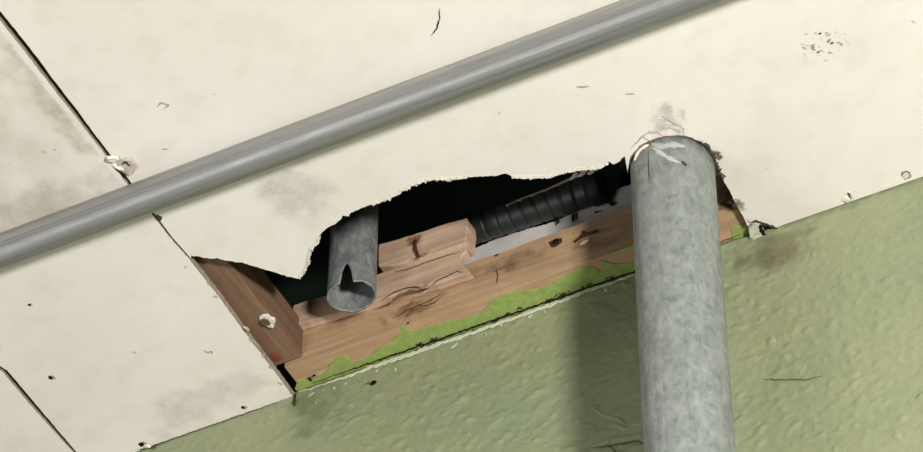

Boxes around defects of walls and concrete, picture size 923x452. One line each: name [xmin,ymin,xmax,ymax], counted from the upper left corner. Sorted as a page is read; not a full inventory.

crack [631,116,684,148]
peeling [298,274,635,404]
crack [596,440,643,452]